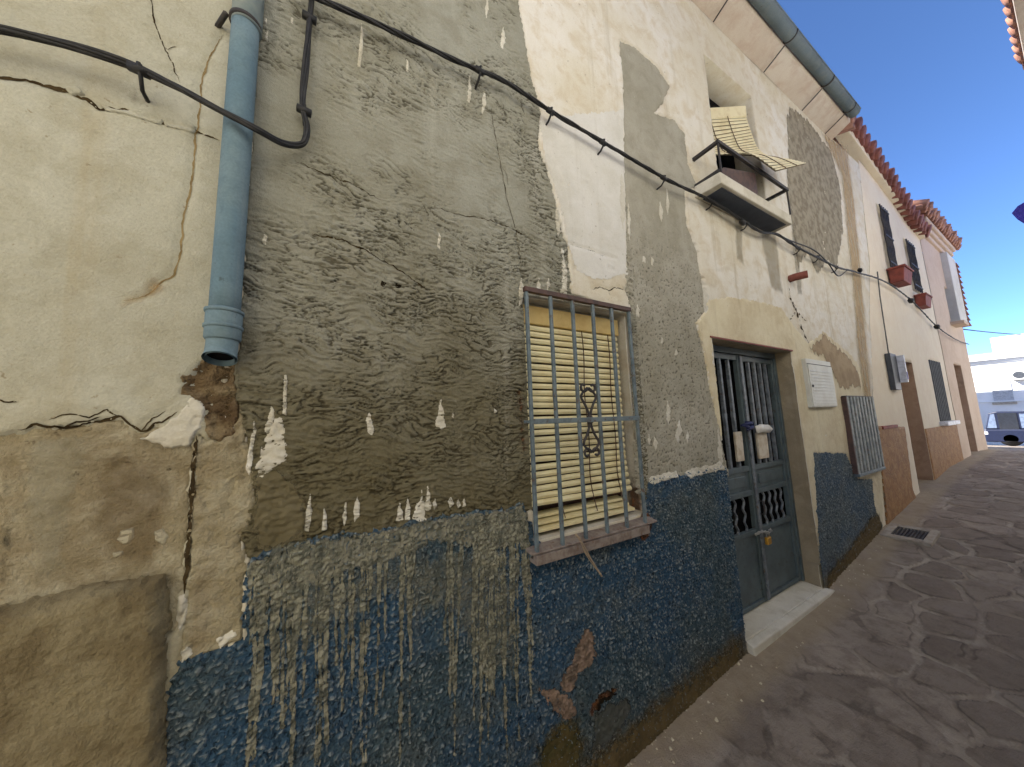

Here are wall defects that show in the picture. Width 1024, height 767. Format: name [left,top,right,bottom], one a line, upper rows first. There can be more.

crack [0,0,222,301]
crack [22,409,177,432]
crack [183,436,198,594]
peeling [0,0,869,663]
peeling [857,471,884,524]
damp [245,525,416,767]
damp [443,511,534,762]